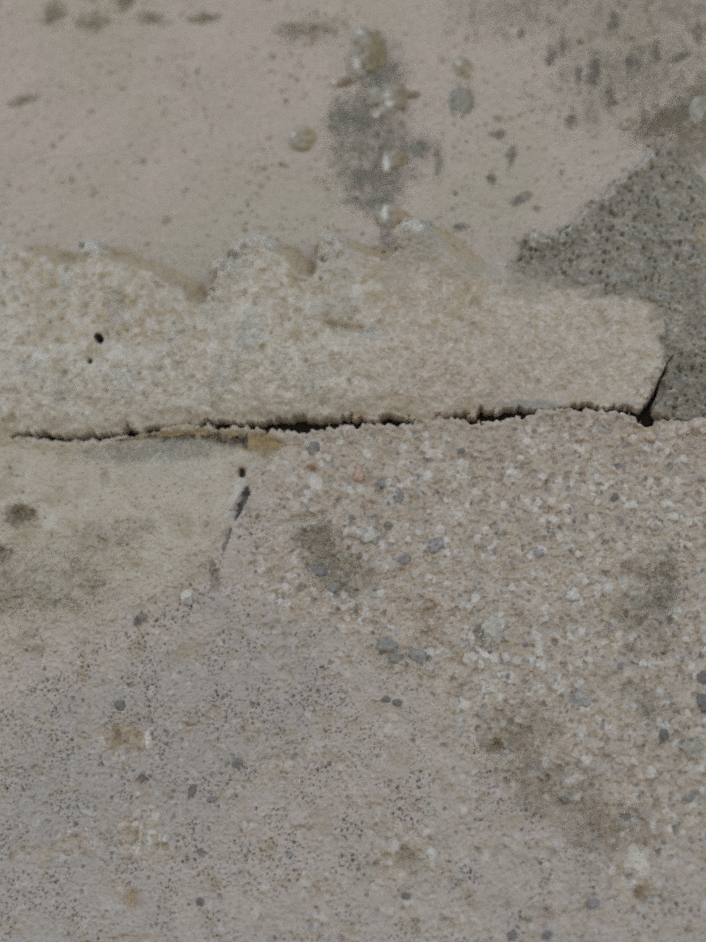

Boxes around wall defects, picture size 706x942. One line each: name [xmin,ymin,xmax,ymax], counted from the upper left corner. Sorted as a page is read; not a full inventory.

leakage [333,100,430,208]
crack [573,381,660,427]
crack [454,411,535,425]
crack [210,419,410,434]
crack [40,429,159,442]